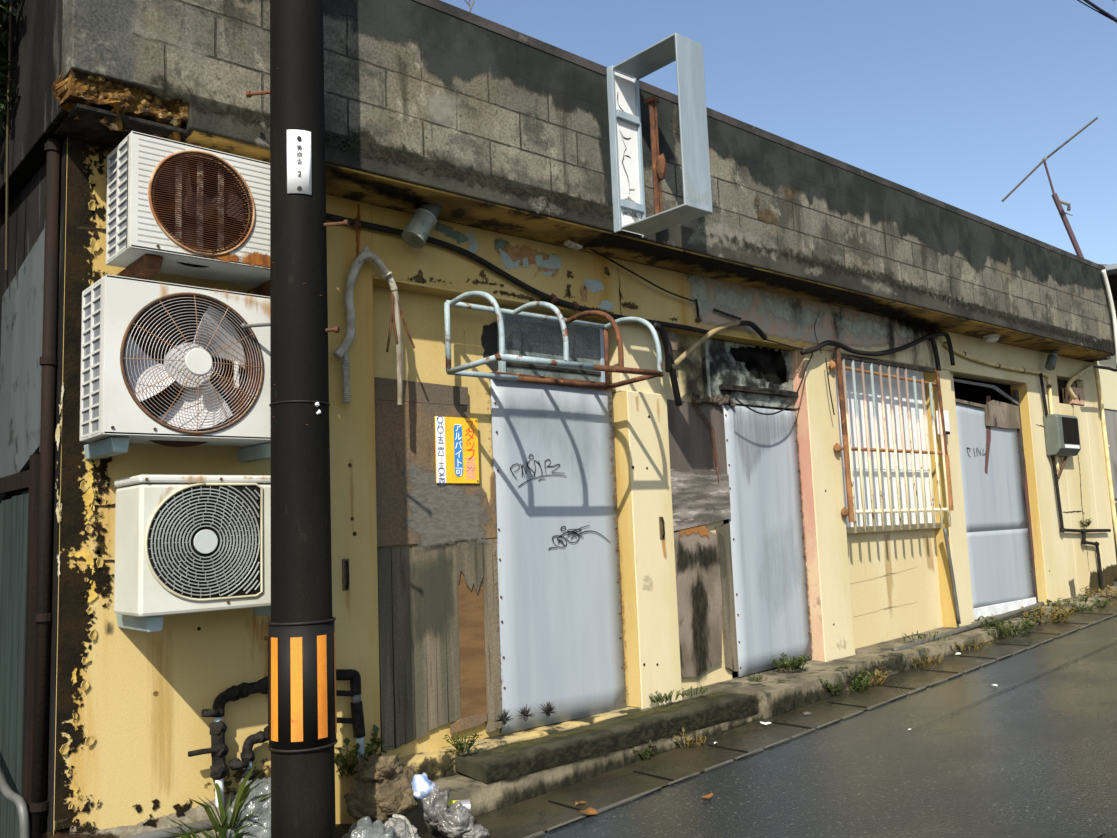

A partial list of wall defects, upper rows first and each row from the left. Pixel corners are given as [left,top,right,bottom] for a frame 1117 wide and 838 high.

damp [323,0,613,207]
damp [639,89,680,166]
corrosion [209,252,270,268]
peeling [408,269,452,288]
peeling [435,222,479,254]
peeling [466,239,638,314]
damp [707,116,1106,290]
peeling [46,144,238,838]
damp [677,545,719,679]